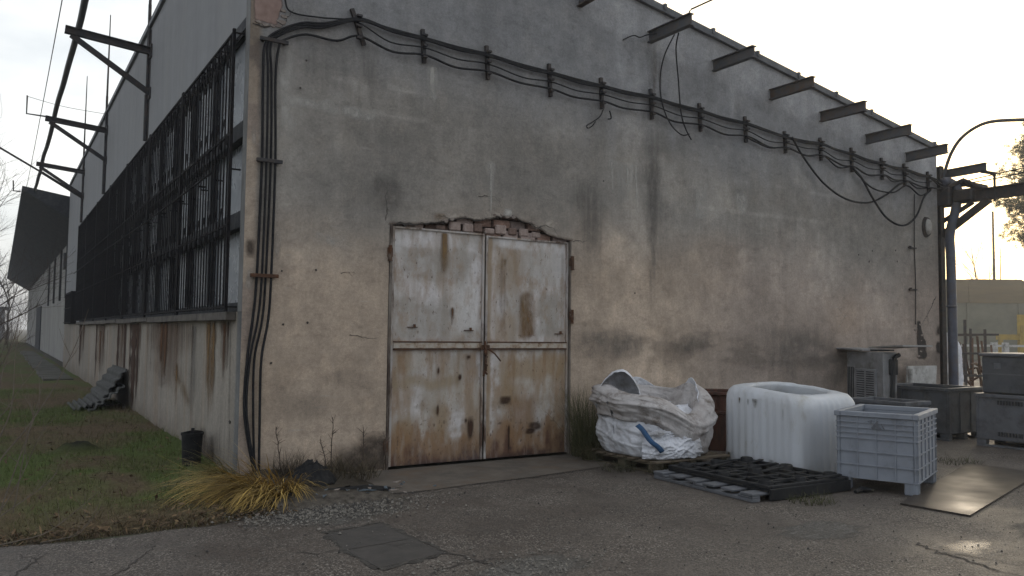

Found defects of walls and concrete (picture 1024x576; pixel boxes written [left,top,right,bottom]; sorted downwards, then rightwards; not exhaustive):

spalling [393,210,567,242]
rust [79,323,141,402]
rust [206,322,229,387]